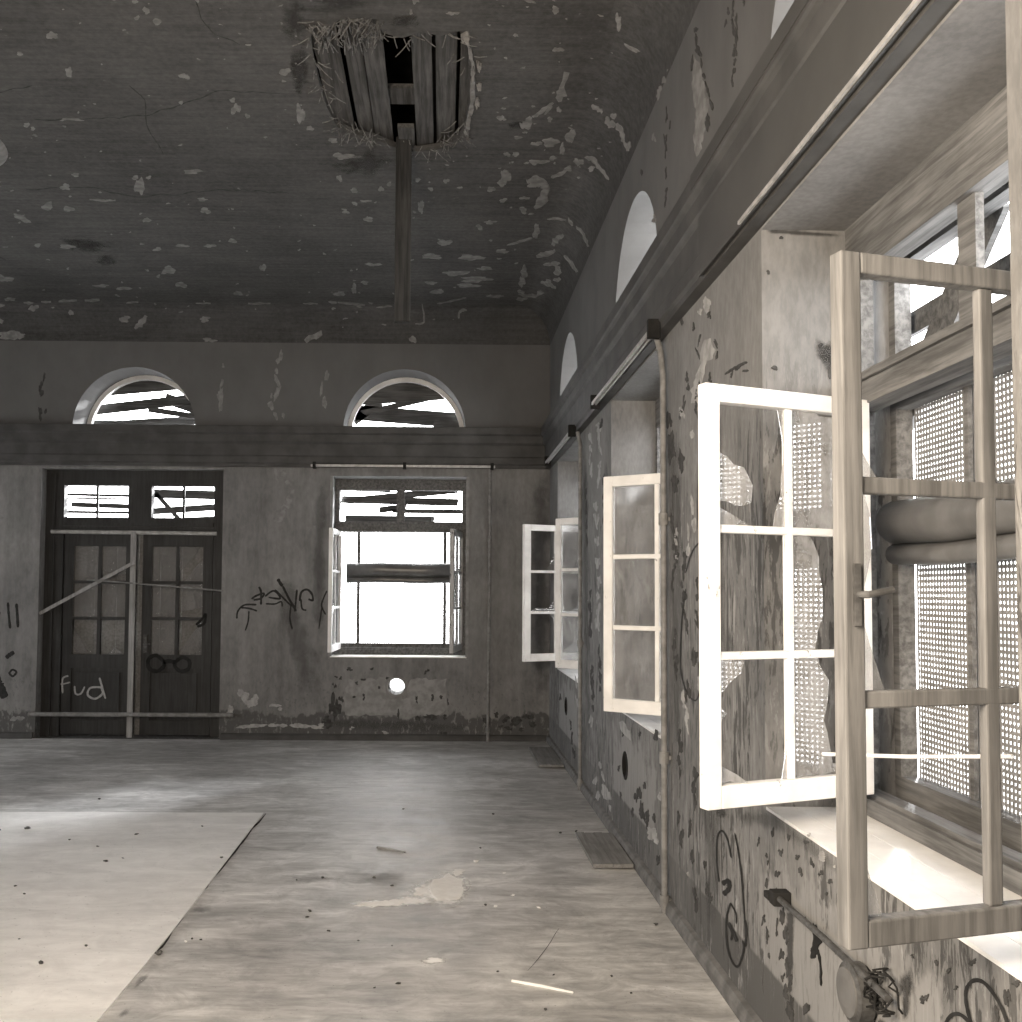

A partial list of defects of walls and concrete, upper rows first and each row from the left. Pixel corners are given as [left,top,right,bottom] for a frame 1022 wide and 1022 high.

spalling [279,17,488,163]
peeling [514,72,609,214]
peeling [690,27,714,157]
peeling [422,217,589,318]
peeling [666,296,718,493]
peeling [227,667,449,730]
peeling [588,558,604,728]
peeling [670,495,700,779]
peeling [592,761,660,866]
peeling [677,754,713,913]
peeling [761,907,810,1022]
spalling [805,917,822,986]